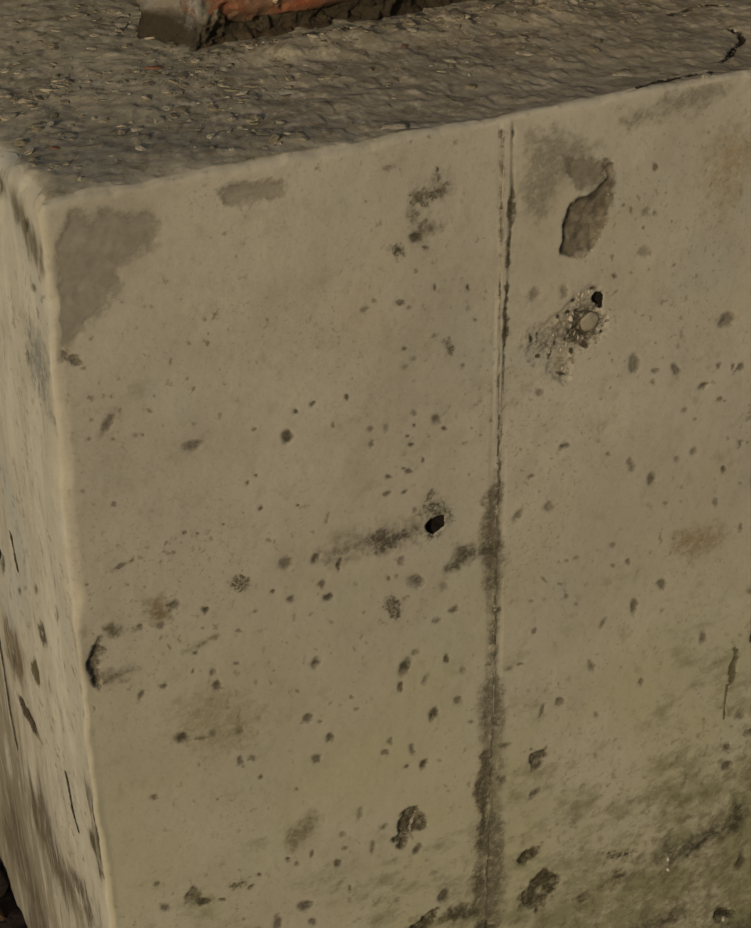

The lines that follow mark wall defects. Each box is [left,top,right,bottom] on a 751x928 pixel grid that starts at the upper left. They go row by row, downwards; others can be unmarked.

damp [499,188,515,268]
spalling [560,162,614,258]
damp [497,282,509,388]
spalling [529,287,606,375]
damp [482,463,501,588]
spalling [391,806,427,849]
damp [473,751,500,866]
damp [683,827,718,857]
spalling [519,869,559,911]